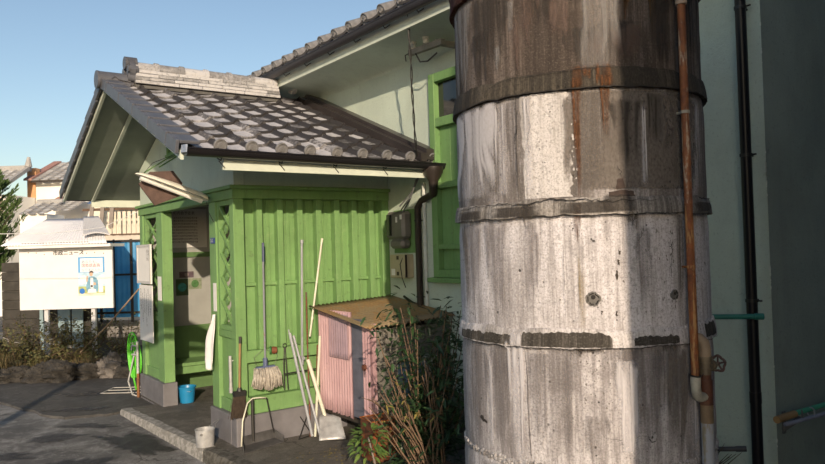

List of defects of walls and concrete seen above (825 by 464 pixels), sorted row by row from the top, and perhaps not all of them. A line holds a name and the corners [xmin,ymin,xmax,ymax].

damp [455,0,639,89]
damp [649,0,698,58]
damp [457,104,505,195]
damp [460,211,503,301]
damp [495,203,534,225]
damp [530,234,538,289]
rust [572,63,612,195]
damp [563,90,697,256]
damp [505,335,524,443]
damp [617,362,638,450]